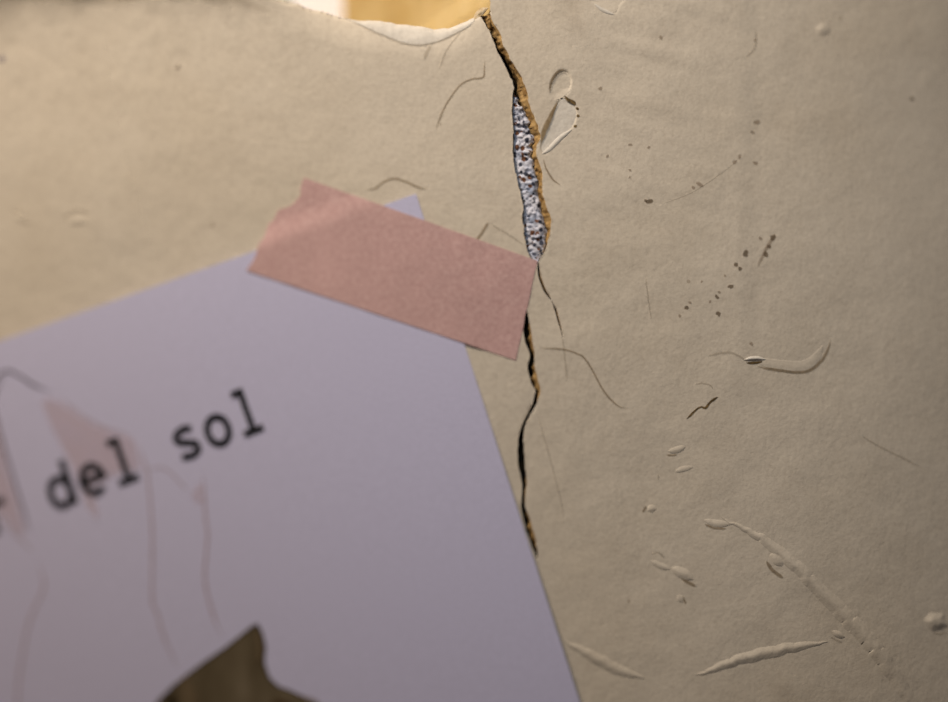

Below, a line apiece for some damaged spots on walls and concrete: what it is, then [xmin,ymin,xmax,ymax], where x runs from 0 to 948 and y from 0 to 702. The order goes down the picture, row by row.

crack [437,13,620,558]
flaking render [541,69,579,184]